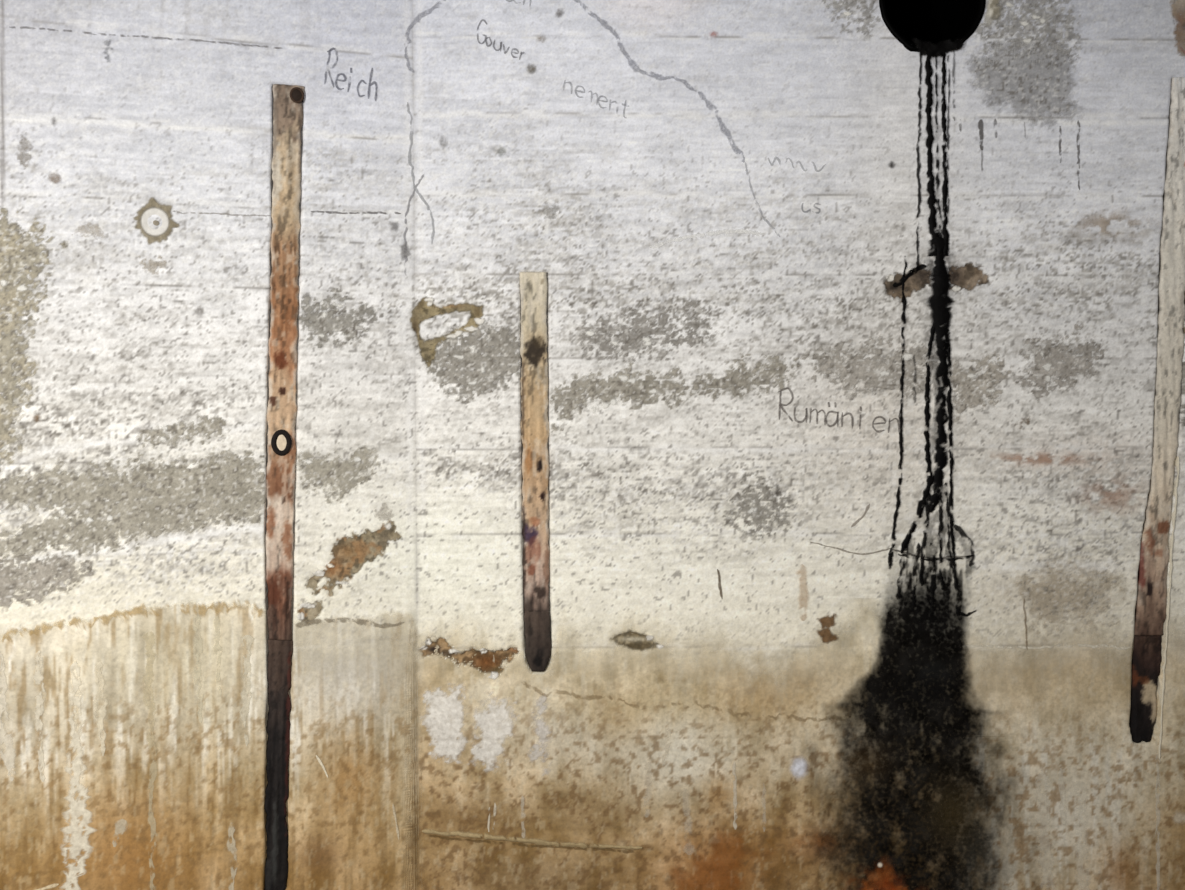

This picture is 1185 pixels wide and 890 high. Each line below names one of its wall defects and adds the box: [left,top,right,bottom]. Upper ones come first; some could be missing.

damp [978,119,997,150]
spalling [884,264,931,302]
spalling [948,262,989,292]
peeling [410,297,521,403]
damp [888,53,976,617]
spalling [297,521,401,623]
spalling [420,638,518,679]
damp [0,603,269,890]
damp [285,610,882,890]
damp [965,635,1185,890]
rust [858,863,906,890]